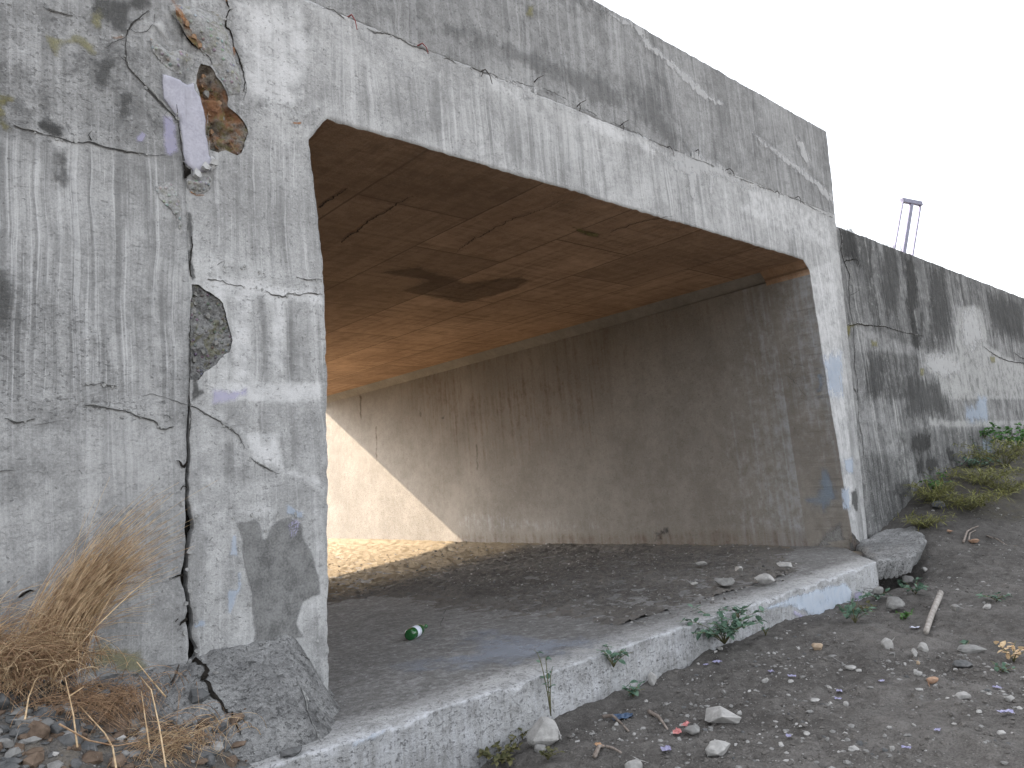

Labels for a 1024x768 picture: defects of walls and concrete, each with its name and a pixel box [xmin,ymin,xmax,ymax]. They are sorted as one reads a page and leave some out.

crack [14,10,185,161]
crack [85,326,279,735]
spalling [188,284,233,406]
crack [369,29,919,462]